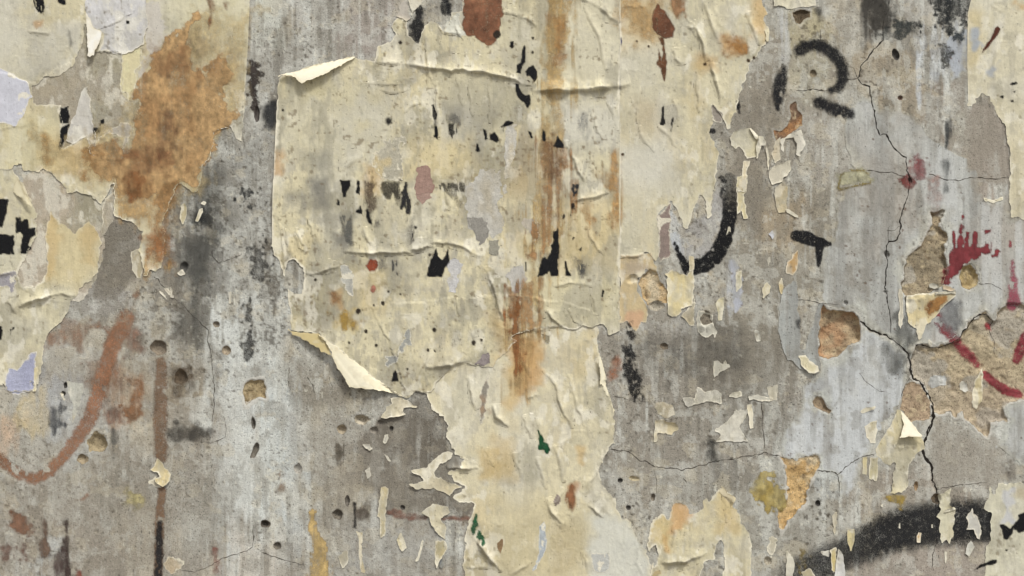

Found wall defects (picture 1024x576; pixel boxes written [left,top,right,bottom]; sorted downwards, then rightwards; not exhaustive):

corrosion [27,0,244,277]
spalling [242,376,269,429]
spalling [332,495,350,520]
spalling [337,414,394,434]
corrosion [503,0,596,400]
crack [611,403,790,493]
peeling [774,96,1024,536]
crack [796,1,1005,566]